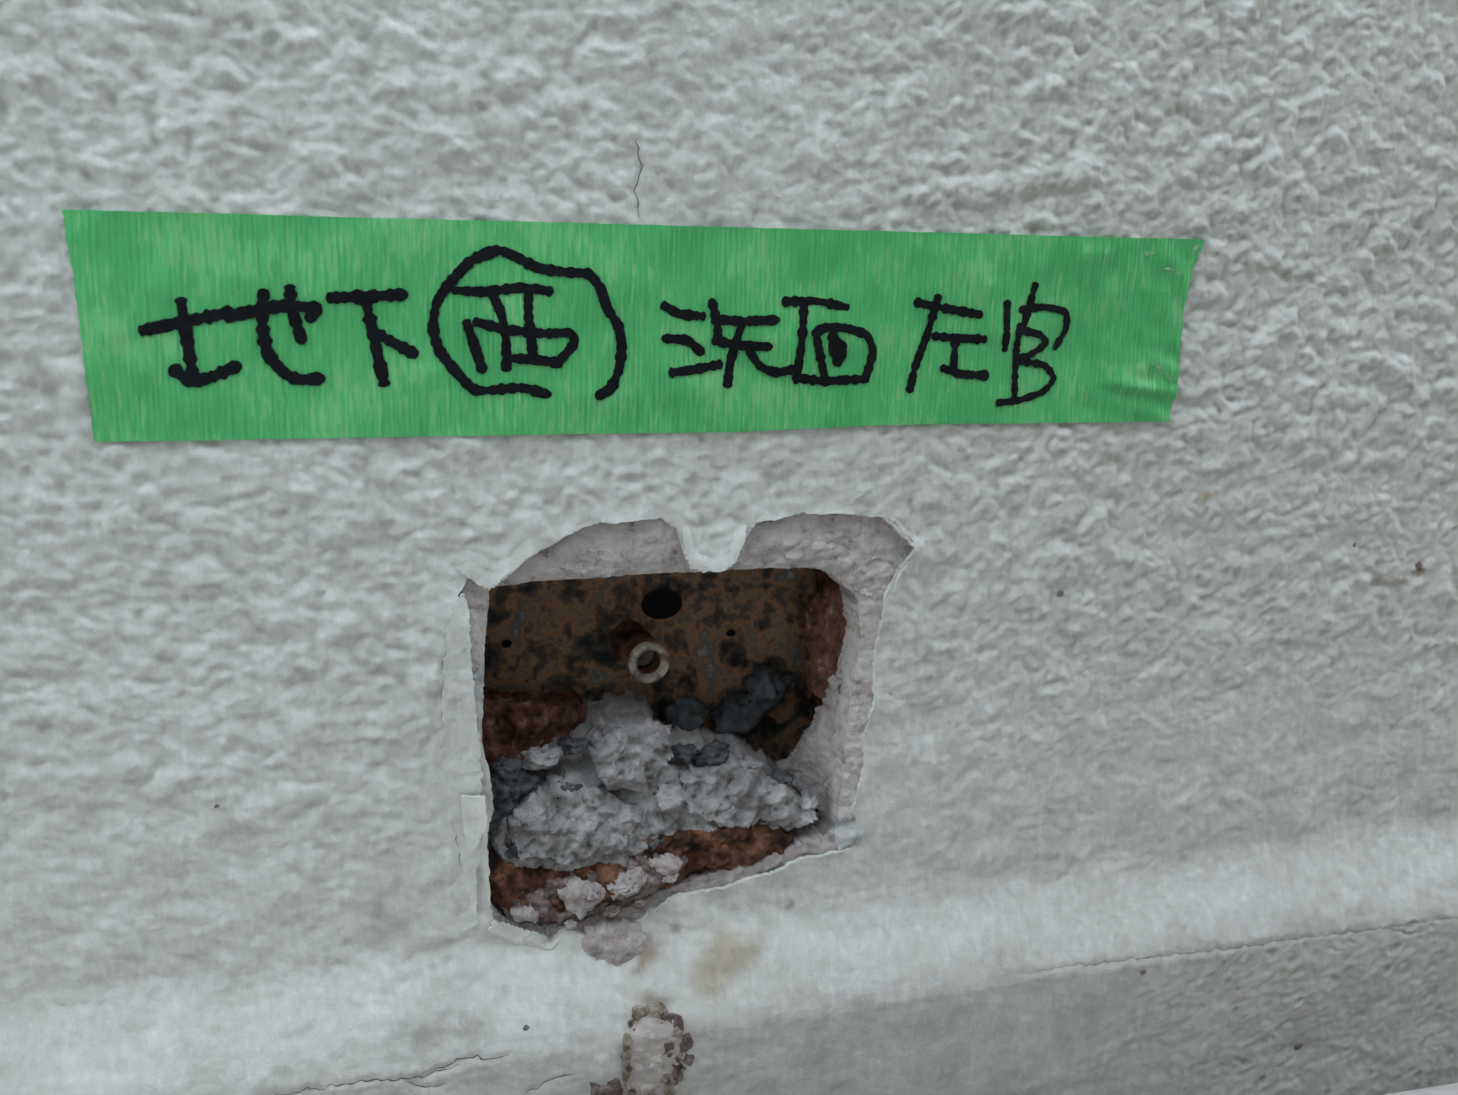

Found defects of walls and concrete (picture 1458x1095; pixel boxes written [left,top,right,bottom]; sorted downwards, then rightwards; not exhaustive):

spalling [439,512,913,945]
crack [276,1054,508,1095]
peeling [589,1002,695,1095]